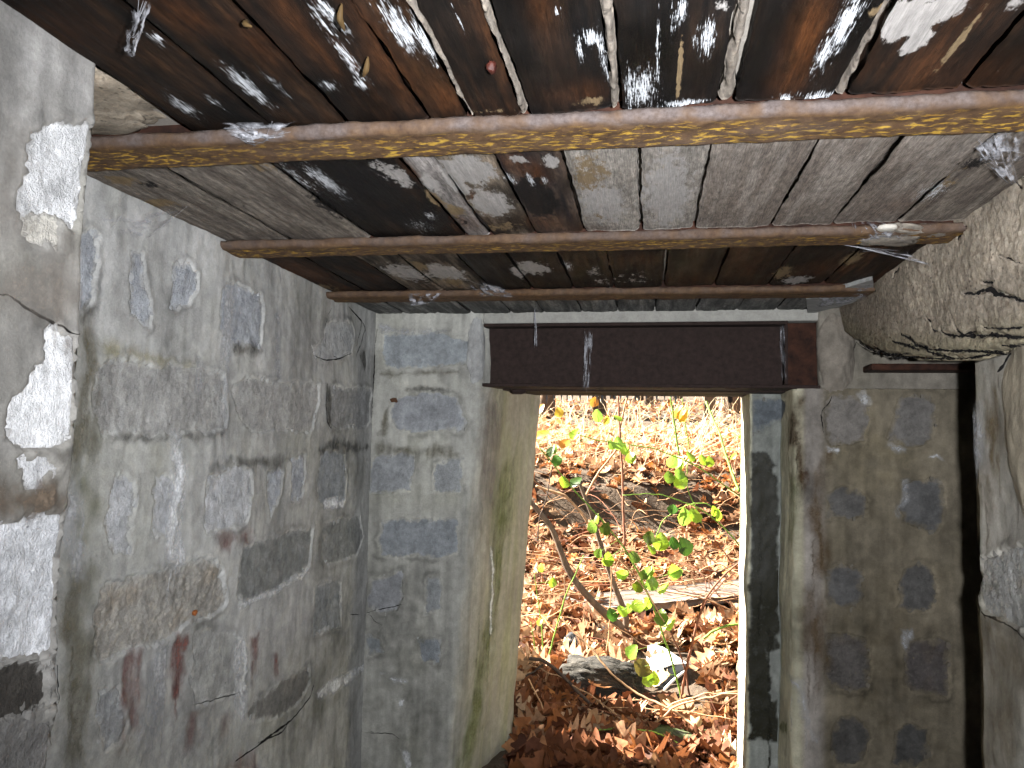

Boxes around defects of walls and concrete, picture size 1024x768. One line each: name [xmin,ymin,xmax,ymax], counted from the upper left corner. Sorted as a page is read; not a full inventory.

spalling [16,120,101,313]
crack [0,294,80,335]
crack [854,281,1024,373]
spalling [5,322,73,493]
crack [236,685,314,761]